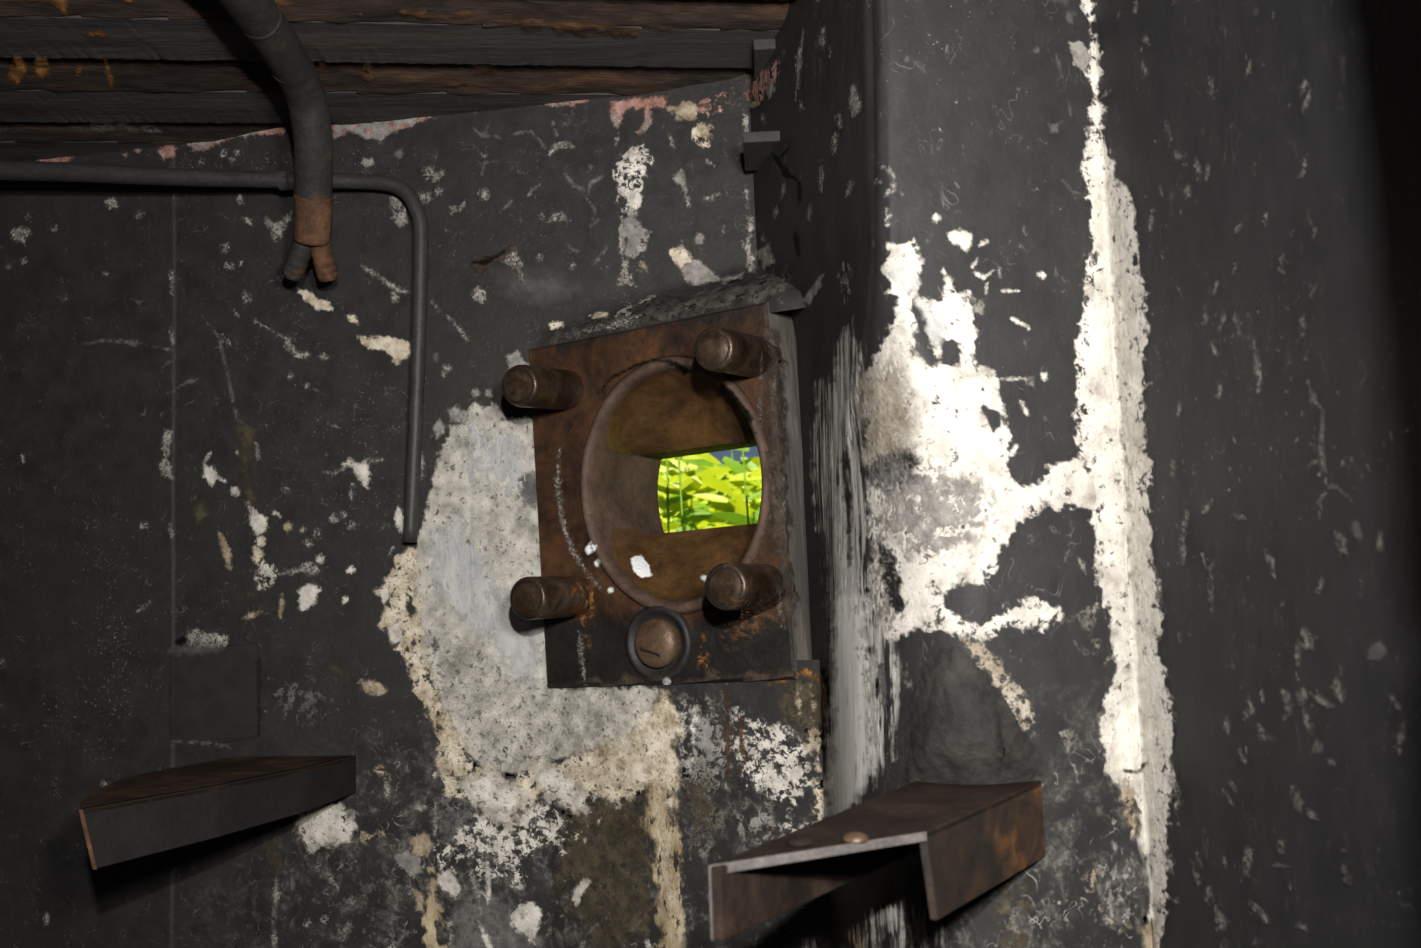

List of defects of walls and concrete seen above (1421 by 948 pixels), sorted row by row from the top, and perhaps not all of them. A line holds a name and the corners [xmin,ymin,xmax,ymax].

peeling [360,264,409,303]
peeling [858,166,1111,734]
peeling [1178,498,1214,613]
peeling [1334,522,1383,555]
peeling [322,389,685,948]
rust [568,571,595,646]
rust [698,597,777,669]
peeling [1295,628,1314,666]
peeling [1058,730,1082,756]
peeling [1223,666,1346,767]
peeling [1289,786,1319,821]
peeling [1192,852,1230,948]